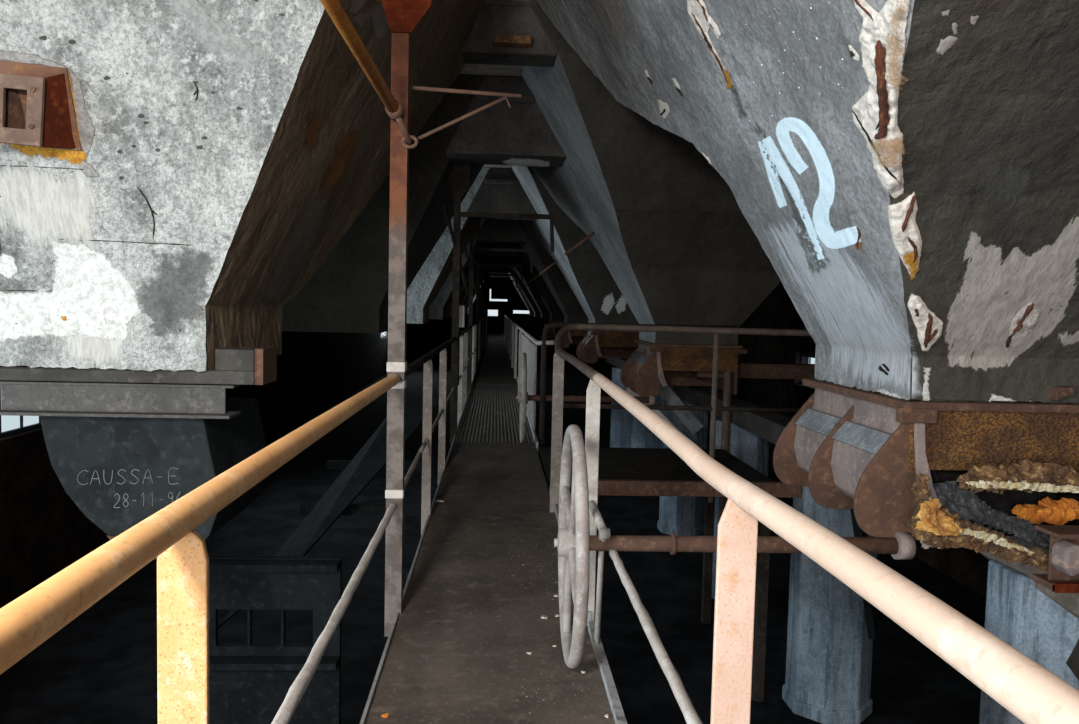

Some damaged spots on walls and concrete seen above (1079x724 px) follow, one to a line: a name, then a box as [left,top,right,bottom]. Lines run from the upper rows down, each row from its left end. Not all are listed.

spalling [936,9,979,55]
rust [0,72,88,164]
crack [0,164,98,172]
spalling [848,0,922,280]
crack [58,187,186,245]
leakage [0,162,213,367]
peeling [907,215,1079,371]